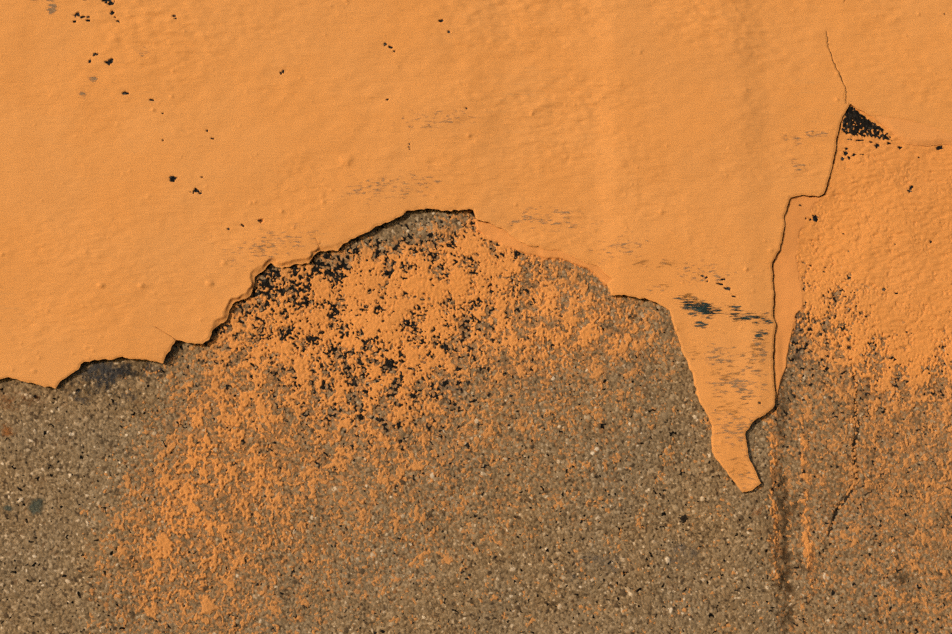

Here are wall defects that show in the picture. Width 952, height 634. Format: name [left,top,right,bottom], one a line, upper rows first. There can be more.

peeling [3,435,59,506]
peeling [62,104,952,634]
crack [772,32,847,398]